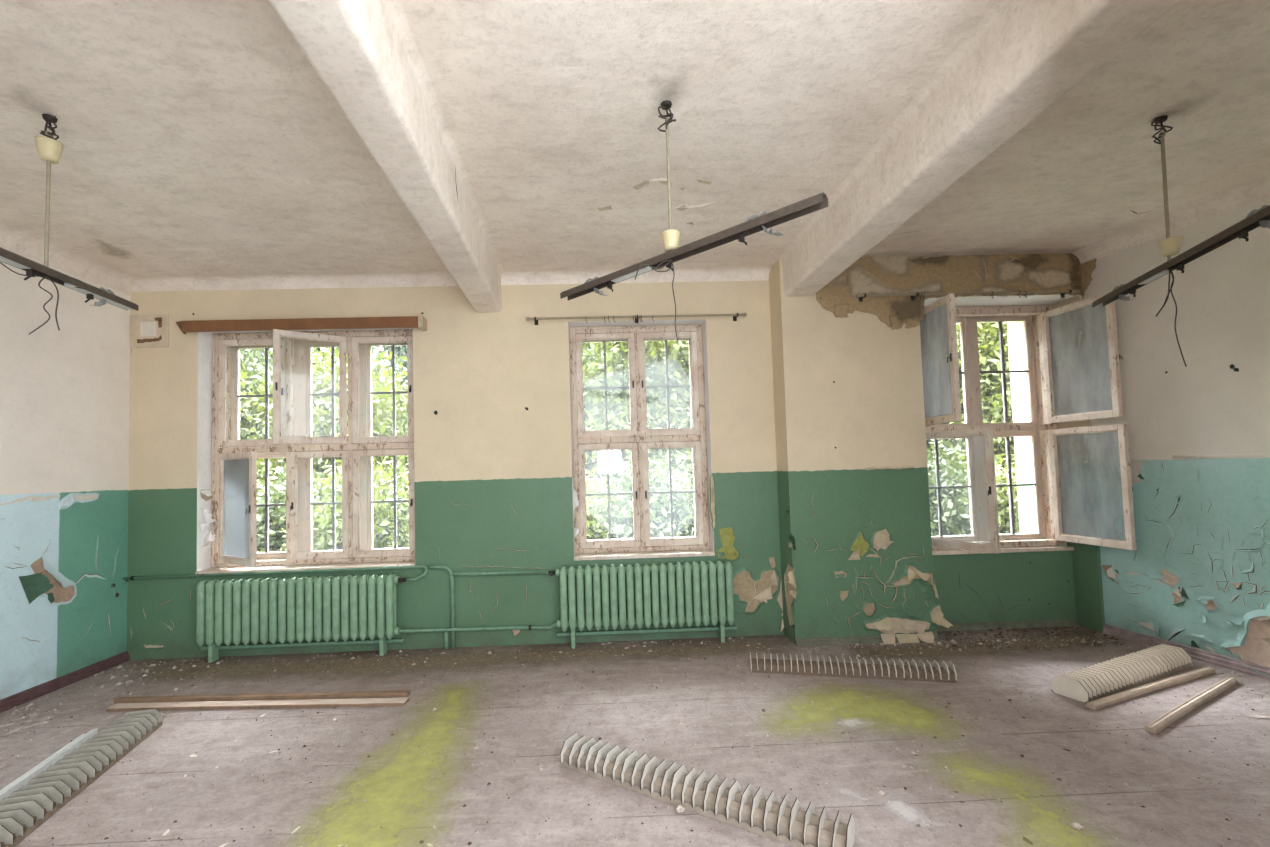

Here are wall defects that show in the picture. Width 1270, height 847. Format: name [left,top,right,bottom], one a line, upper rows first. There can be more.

peeling [0,493,99,510]
peeling [5,539,128,606]
peeling [709,476,797,632]
peeling [833,527,953,644]
peeling [1113,458,1161,493]
spalling [1100,563,1270,678]